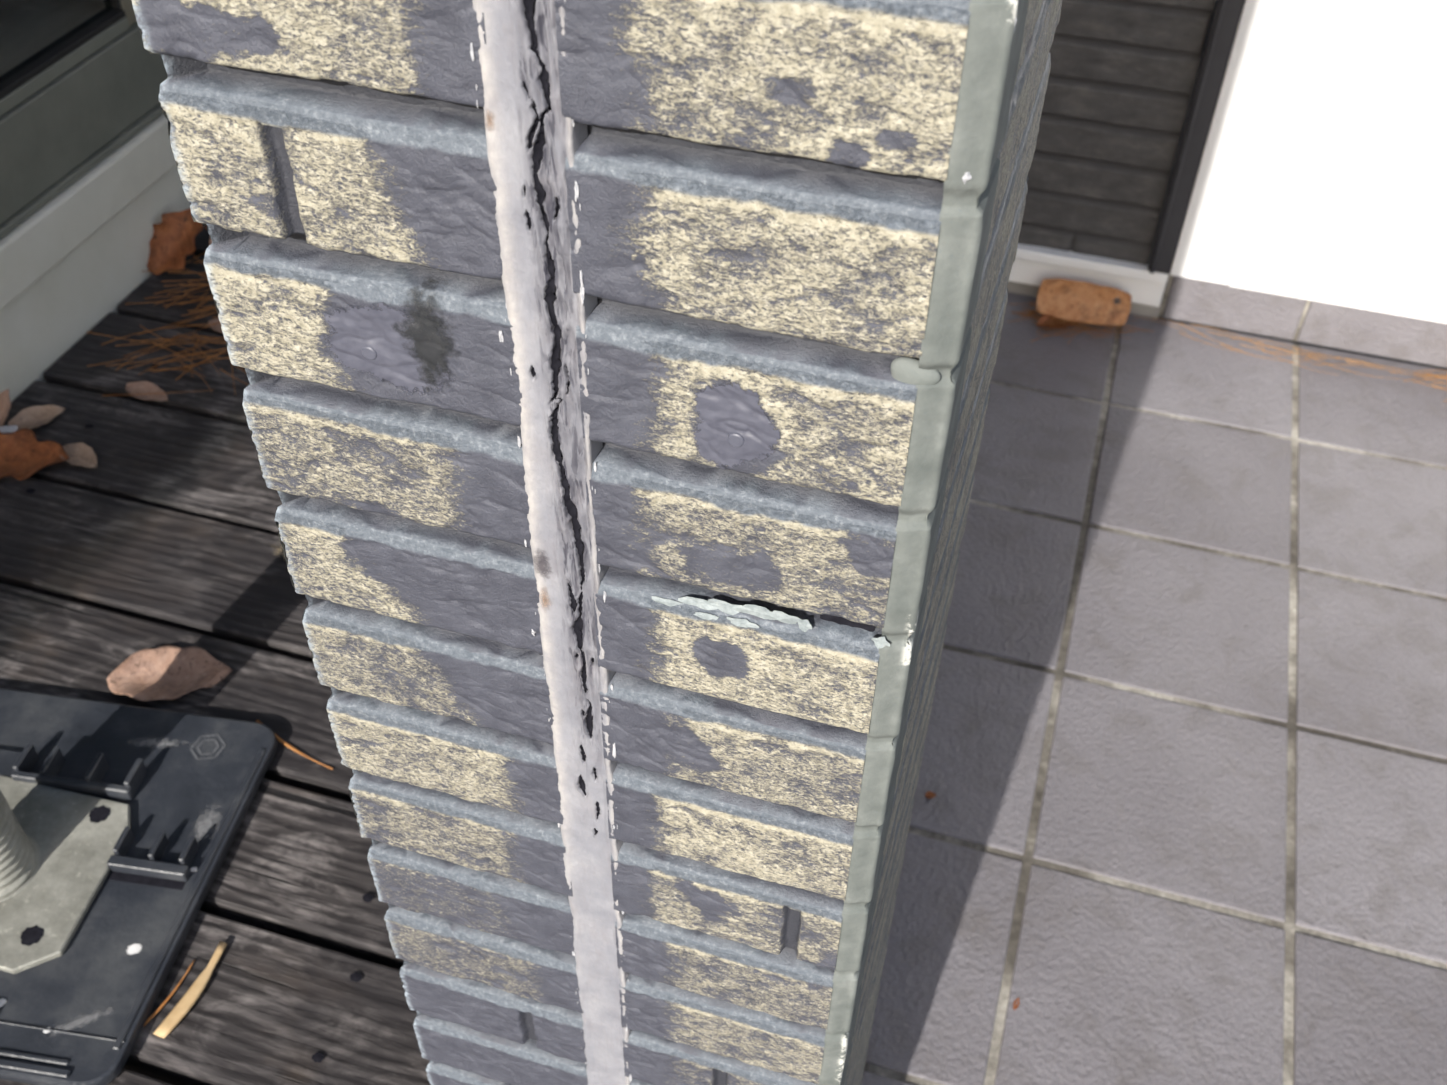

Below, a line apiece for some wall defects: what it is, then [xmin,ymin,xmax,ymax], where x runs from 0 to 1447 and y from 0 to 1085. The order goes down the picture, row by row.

damp [394,280,452,384]
crack [523,0,600,835]